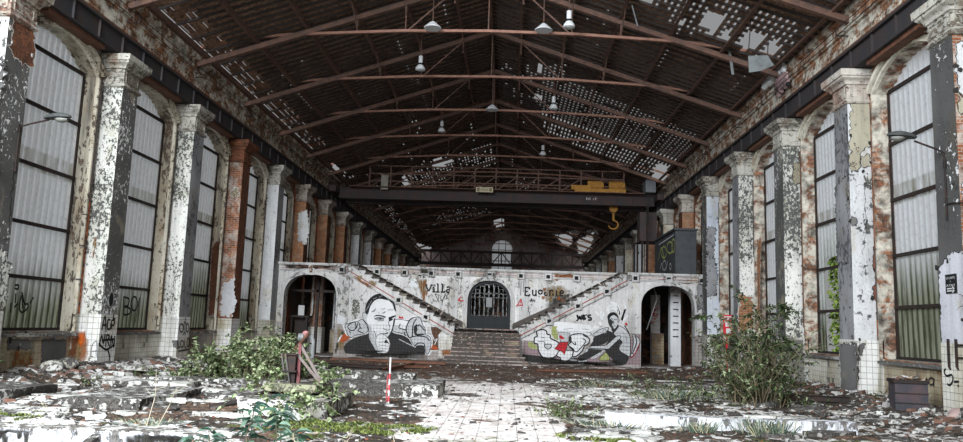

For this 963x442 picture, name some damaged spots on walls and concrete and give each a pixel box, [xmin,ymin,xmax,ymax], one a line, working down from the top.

flaking render [0,18,37,103]
spalling [953,35,963,114]
peeling [834,104,872,266]
peeling [0,249,13,309]
flaking render [208,236,237,317]
rust [69,332,87,361]